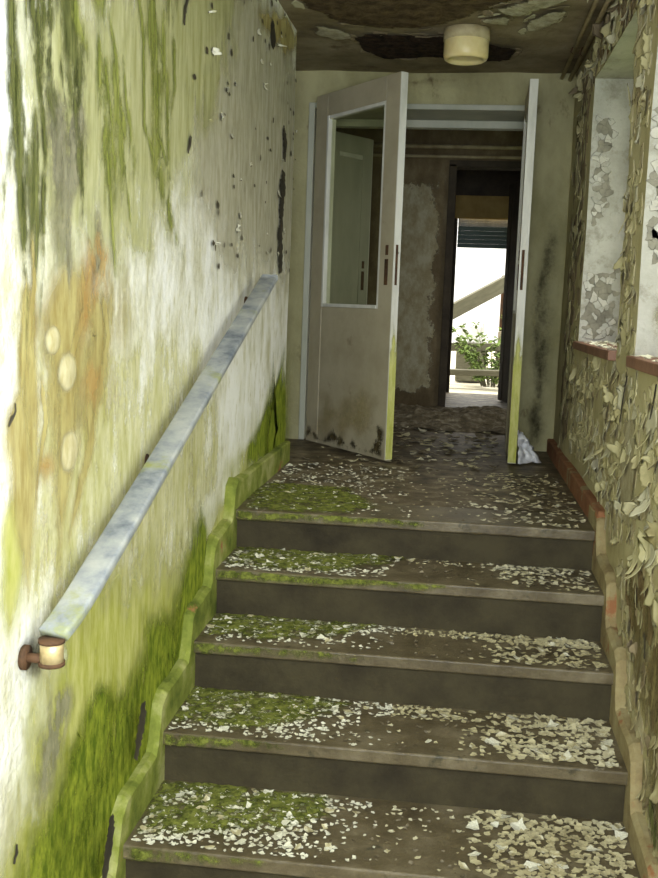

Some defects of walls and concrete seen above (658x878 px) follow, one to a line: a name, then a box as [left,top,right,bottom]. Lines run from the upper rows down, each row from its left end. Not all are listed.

damp [138,0,179,243]
peeling [206,33,233,56]
damp [194,0,297,277]
spalling [253,0,572,62]
damp [3,0,135,624]
peeling [395,182,441,393]
peeling [557,0,658,861]
damp [40,690,70,793]
damp [629,574,658,850]